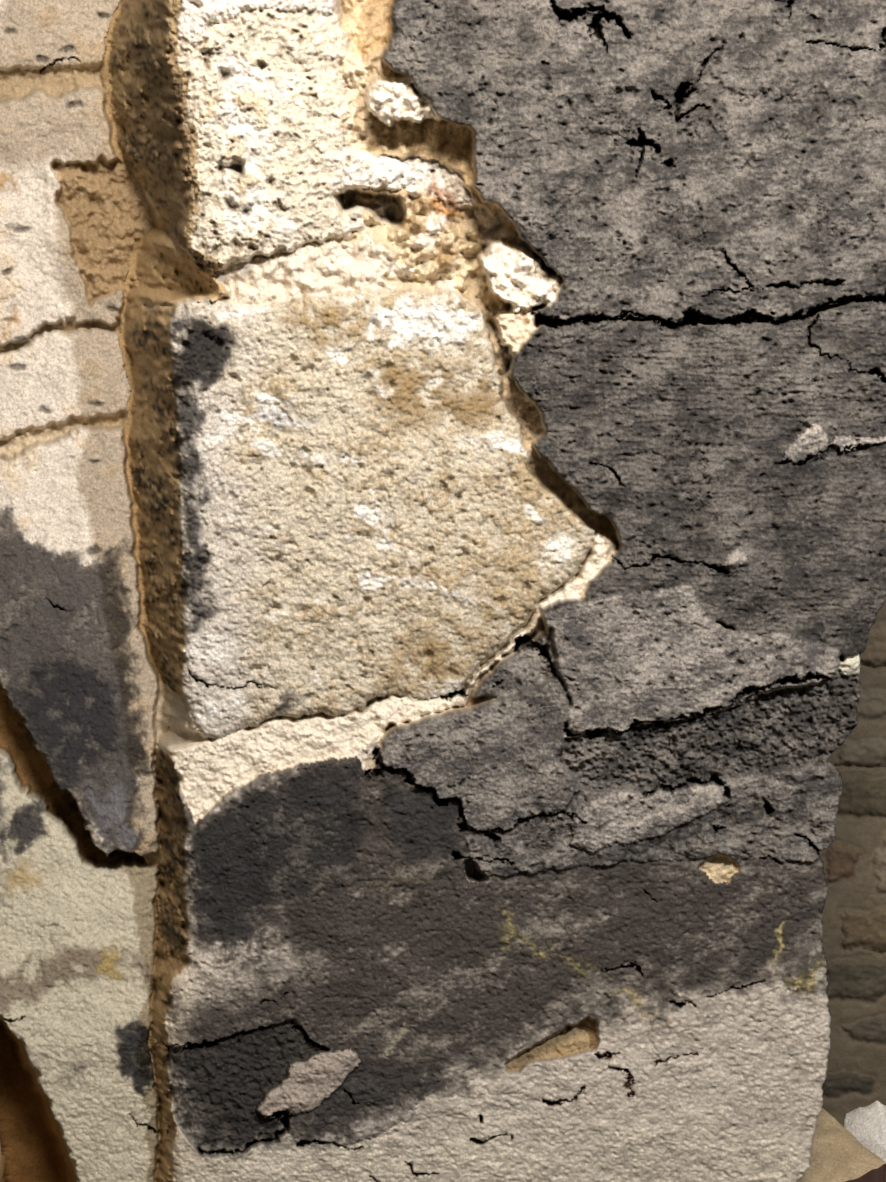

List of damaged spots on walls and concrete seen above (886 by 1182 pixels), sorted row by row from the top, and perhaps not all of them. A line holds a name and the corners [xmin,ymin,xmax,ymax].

spalling [335,186,540,373]
crack [531,249,886,383]
crack [564,672,830,740]
water stain [192,768,364,950]
water stain [382,786,463,859]
crack [371,750,587,867]
crack [643,774,732,834]
crack [764,801,775,816]
water stain [774,923,784,966]
water stain [784,959,825,993]
water stain [182,1032,302,1145]
water stain [305,1021,445,1138]